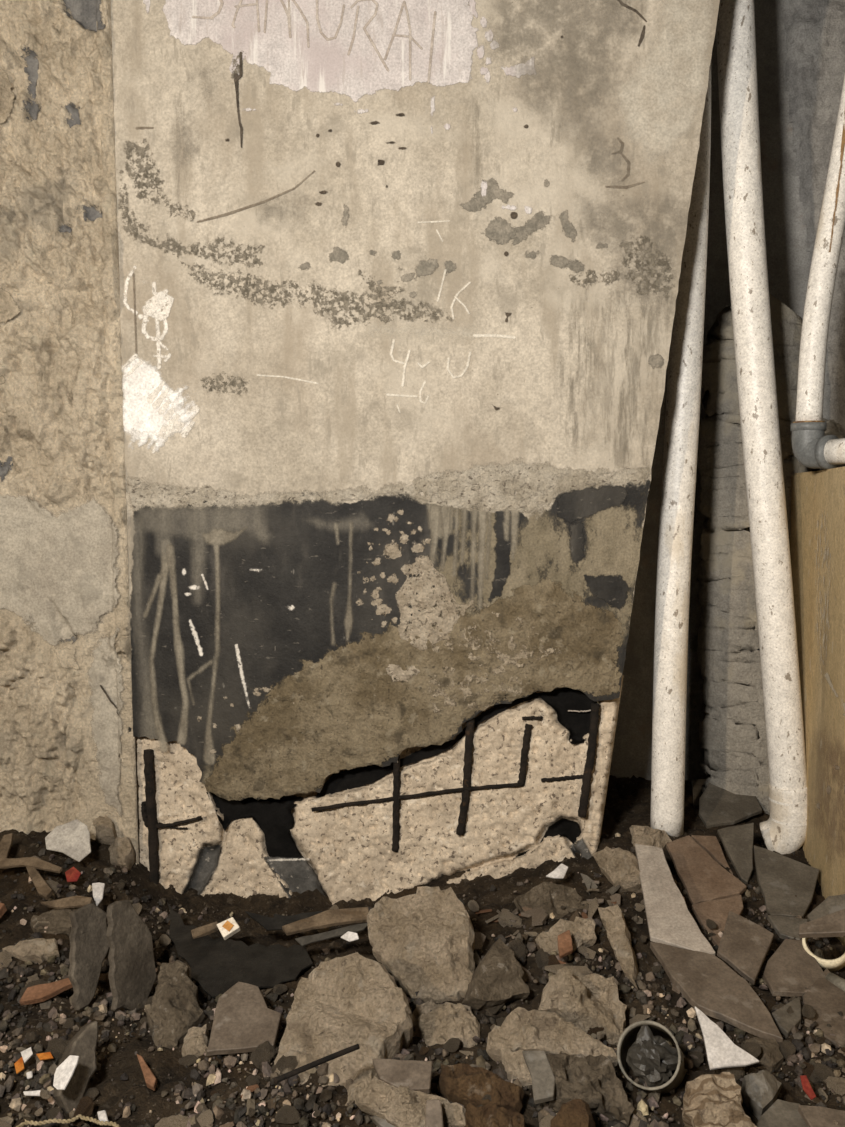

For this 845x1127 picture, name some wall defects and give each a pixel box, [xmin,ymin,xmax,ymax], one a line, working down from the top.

water stain [569,236,673,300]
flaking render [126,458,649,514]
water stain [144,545,212,744]
water stain [356,505,562,714]
spalling [141,749,202,884]
spalling [312,716,543,852]
spalling [541,703,600,818]